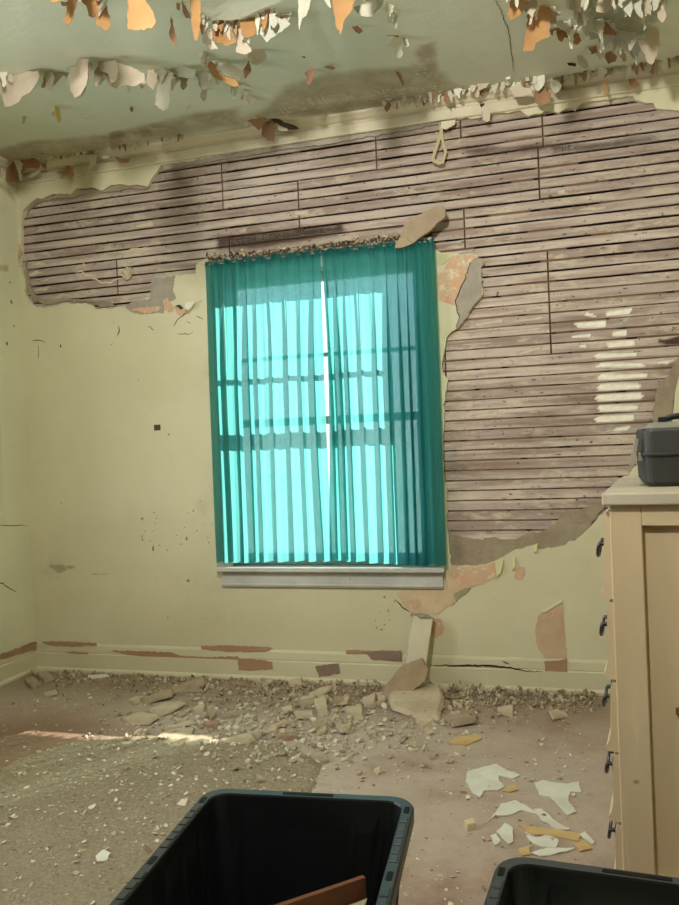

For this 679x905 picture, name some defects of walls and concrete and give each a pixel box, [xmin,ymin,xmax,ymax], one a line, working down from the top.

flaking render [0,0,679,638]
peeling [535,600,567,672]
peeling [0,641,97,659]
peeling [112,645,273,671]
crack [433,661,543,672]